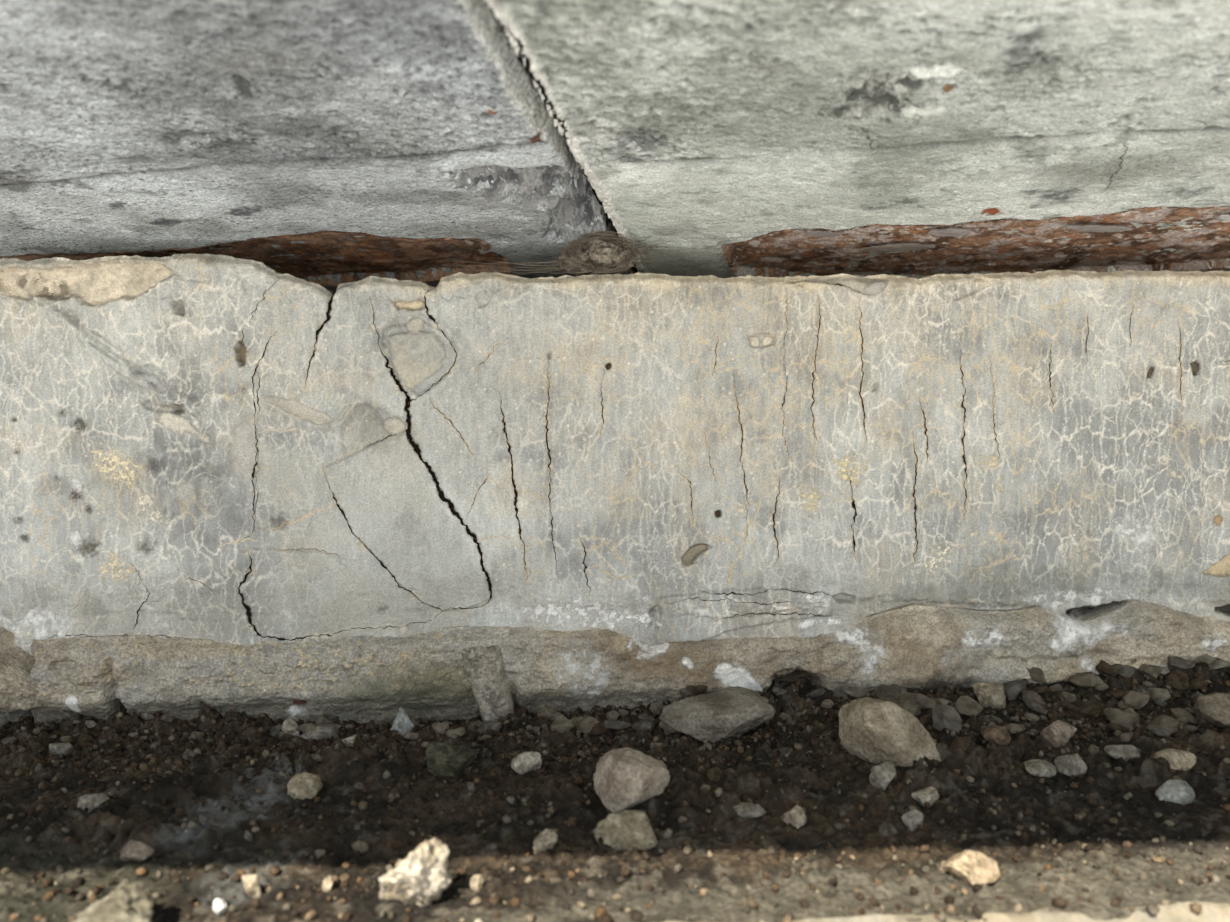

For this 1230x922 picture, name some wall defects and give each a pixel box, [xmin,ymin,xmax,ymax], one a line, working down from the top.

crack [507,20,572,142]
rust [0,231,512,287]
rust [721,206,1230,279]
crack [48,277,635,641]
crack [615,281,873,621]
crack [913,401,928,563]
crack [943,298,1000,517]
crack [1028,283,1054,413]